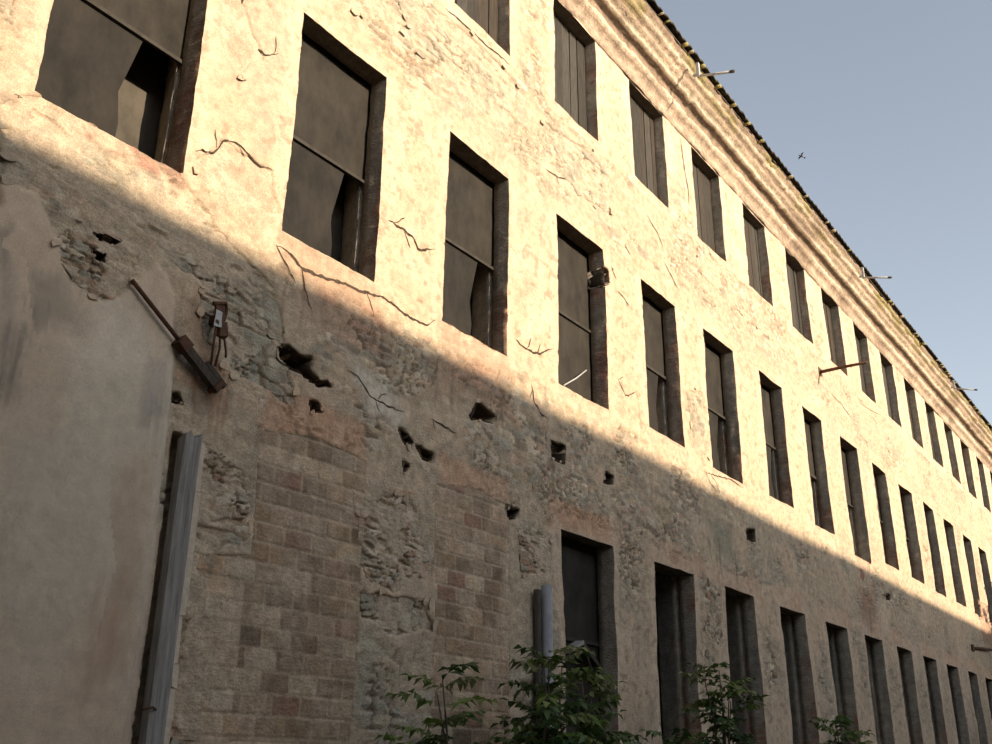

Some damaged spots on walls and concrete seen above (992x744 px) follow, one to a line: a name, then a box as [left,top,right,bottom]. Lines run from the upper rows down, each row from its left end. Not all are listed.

spalling [345,0,430,36]
crack [195,130,274,171]
spalling [0,96,300,408]
crack [389,217,432,252]
crack [276,244,435,326]
crack [516,339,554,355]
crack [348,370,404,414]